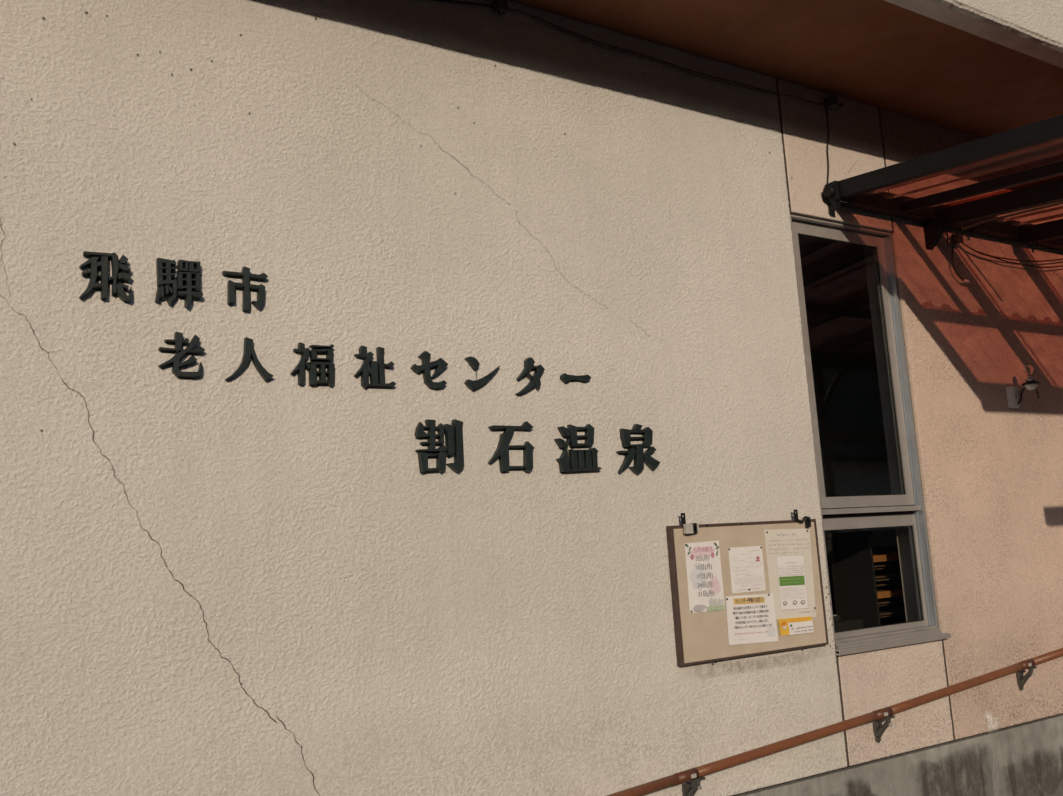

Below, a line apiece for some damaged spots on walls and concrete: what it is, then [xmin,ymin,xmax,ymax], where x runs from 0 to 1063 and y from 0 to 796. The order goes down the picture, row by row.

crack [0,216,320,795]